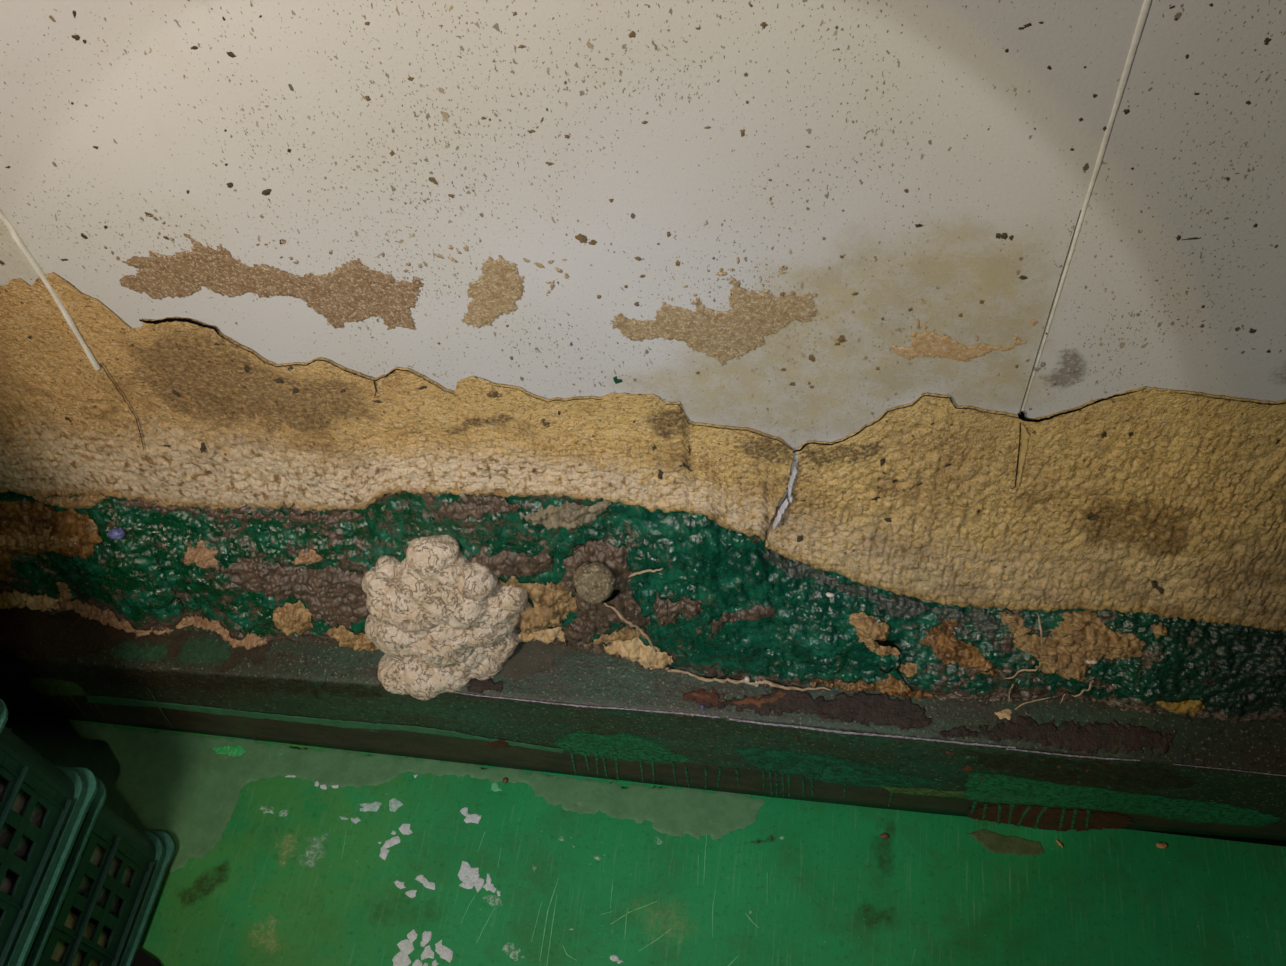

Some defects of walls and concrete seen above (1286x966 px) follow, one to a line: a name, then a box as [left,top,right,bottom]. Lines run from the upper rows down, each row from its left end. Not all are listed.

peeling [104,214,424,330]
crack [139,318,452,398]
crack [492,385,602,403]
crack [1178,393,1285,405]
crack [667,389,1144,489]
peeling [0,255,1168,699]
rust [967,804,1135,832]
peeling [393,875,435,898]
peeling [458,861,503,906]
peeling [392,929,453,966]
peeling [502,943,524,961]